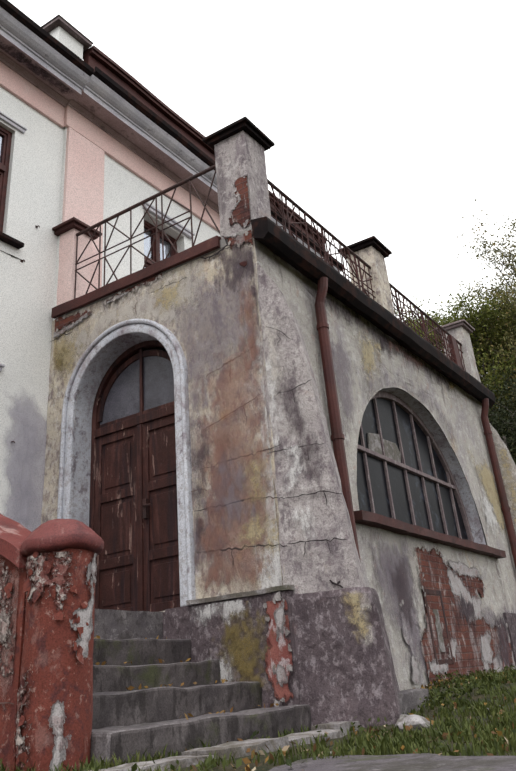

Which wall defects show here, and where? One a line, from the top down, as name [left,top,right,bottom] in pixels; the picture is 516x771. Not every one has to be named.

spalling [224,172,253,249]
spalling [53,309,92,338]
crack [245,380,310,421]
crack [251,443,324,460]
crack [191,489,342,511]
crack [197,537,347,564]
peeling [0,551,97,771]
leakage [200,600,270,683]
peeling [263,591,294,707]
spalling [399,546,516,685]